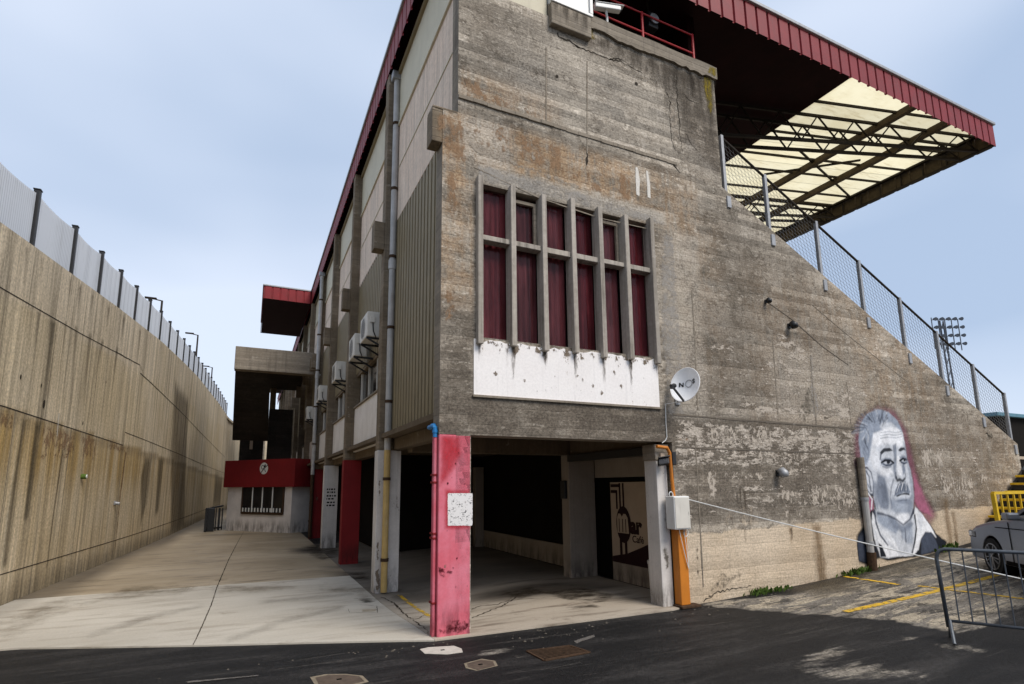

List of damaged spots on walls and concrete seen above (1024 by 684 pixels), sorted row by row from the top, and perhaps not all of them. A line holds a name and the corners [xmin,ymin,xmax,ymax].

crack [557,33,643,74]
crack [665,74,700,170]
peeling [483,339,649,388]
peeling [774,333,809,374]
water stain [9,428,36,532]
water stain [141,392,188,524]
peeling [696,386,858,518]